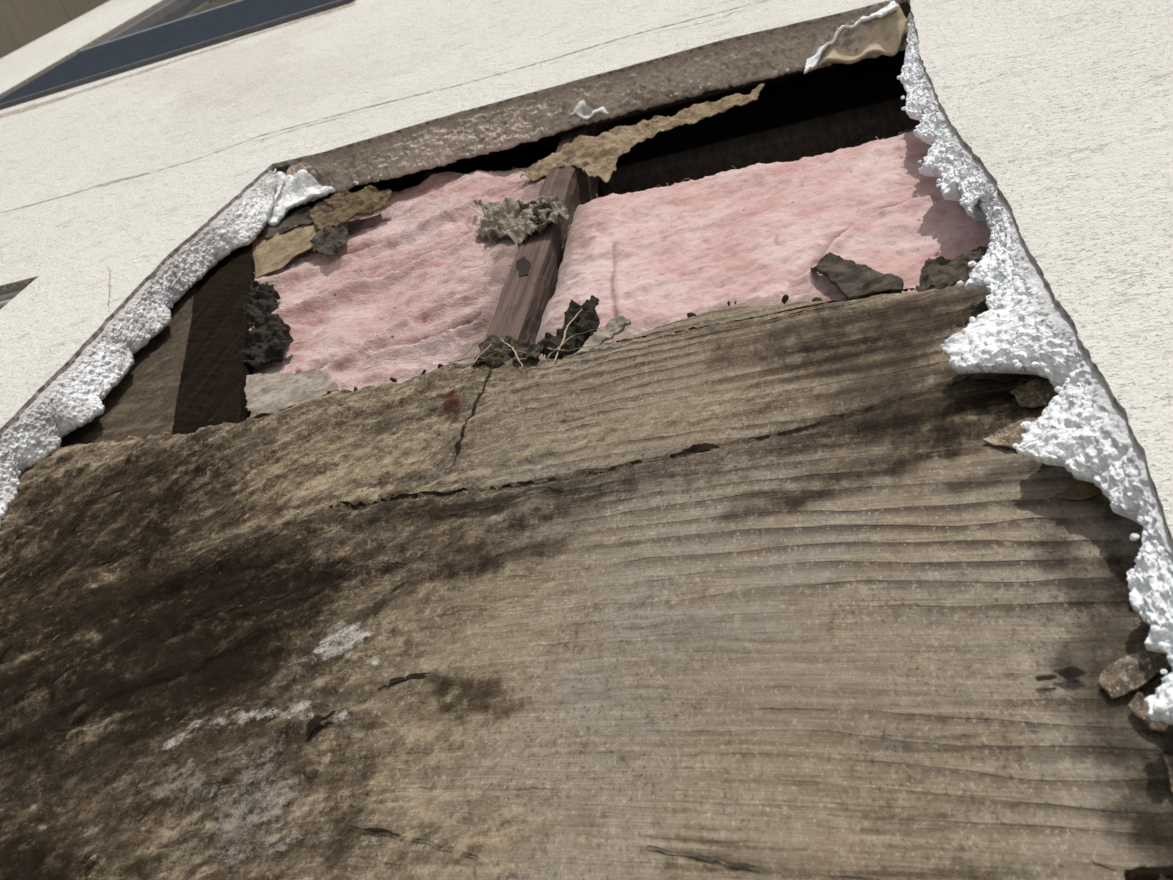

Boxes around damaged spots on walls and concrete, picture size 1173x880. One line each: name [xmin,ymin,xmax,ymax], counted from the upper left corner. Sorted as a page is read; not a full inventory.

peeling [570,100,609,120]
spalling [0,168,336,529]
spalling [774,1,1173,725]
crack [951,375,974,386]
crack [863,393,912,413]
crack [306,362,832,517]
damp [306,711,336,735]